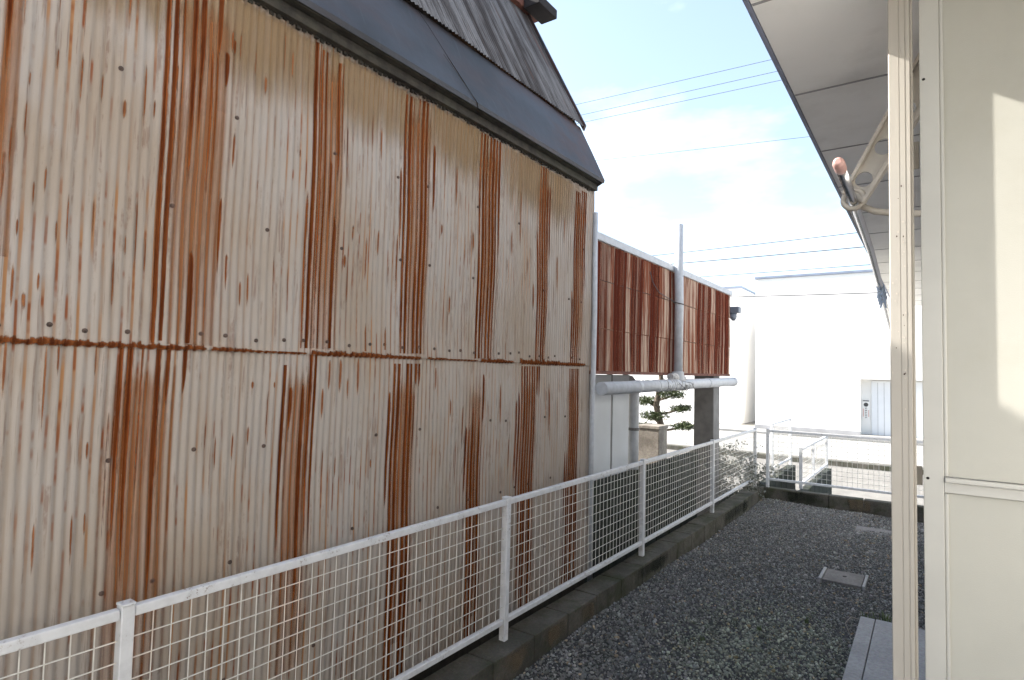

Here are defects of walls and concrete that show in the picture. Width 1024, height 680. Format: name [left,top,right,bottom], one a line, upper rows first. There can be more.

corrosion [0,0,601,680]
corrosion [613,249,675,373]
corrosion [697,283,730,374]